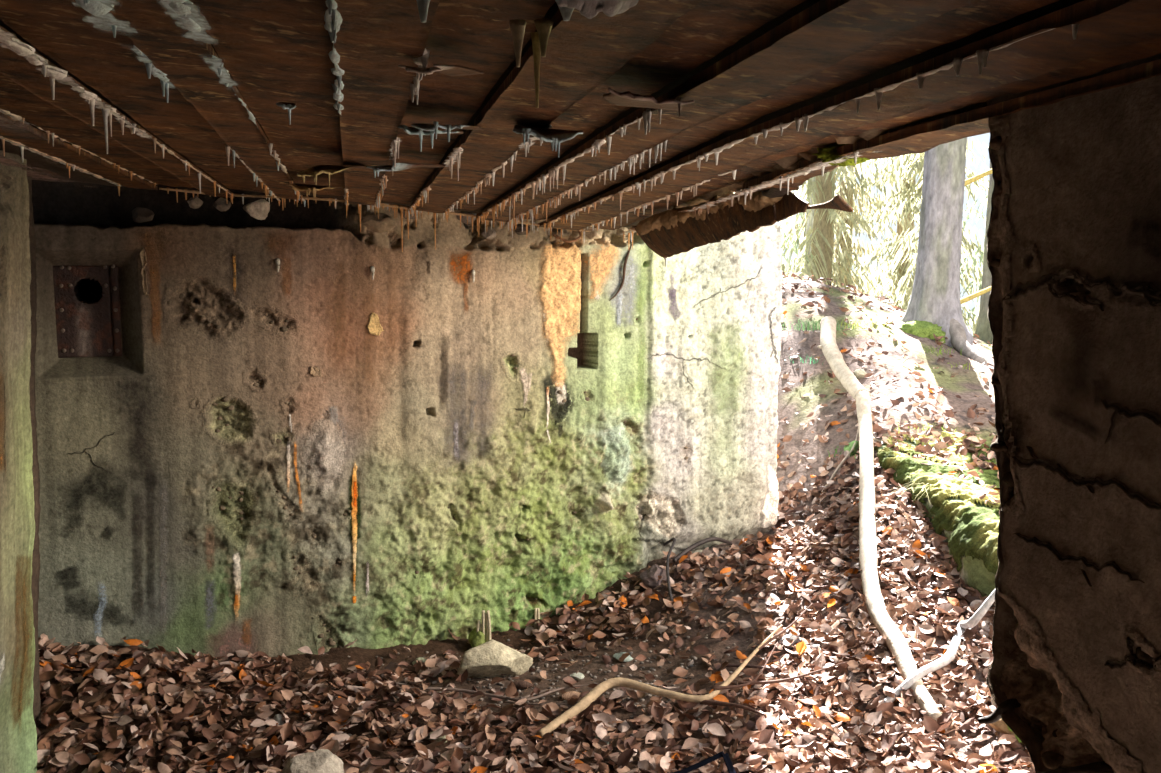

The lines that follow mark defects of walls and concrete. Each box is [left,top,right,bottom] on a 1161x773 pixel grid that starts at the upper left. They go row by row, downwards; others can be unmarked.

efflorescence [0,28,150,138]
leakage [688,155,862,212]
rust [450,253,471,309]
rust [540,243,618,403]
crack [1100,399,1161,444]
leakage [67,382,166,609]
leakage [348,475,361,545]
crack [1012,446,1161,510]
crack [1012,533,1145,587]
leakage [58,567,119,633]
spalling [986,587,1142,773]
crack [1104,637,1161,671]